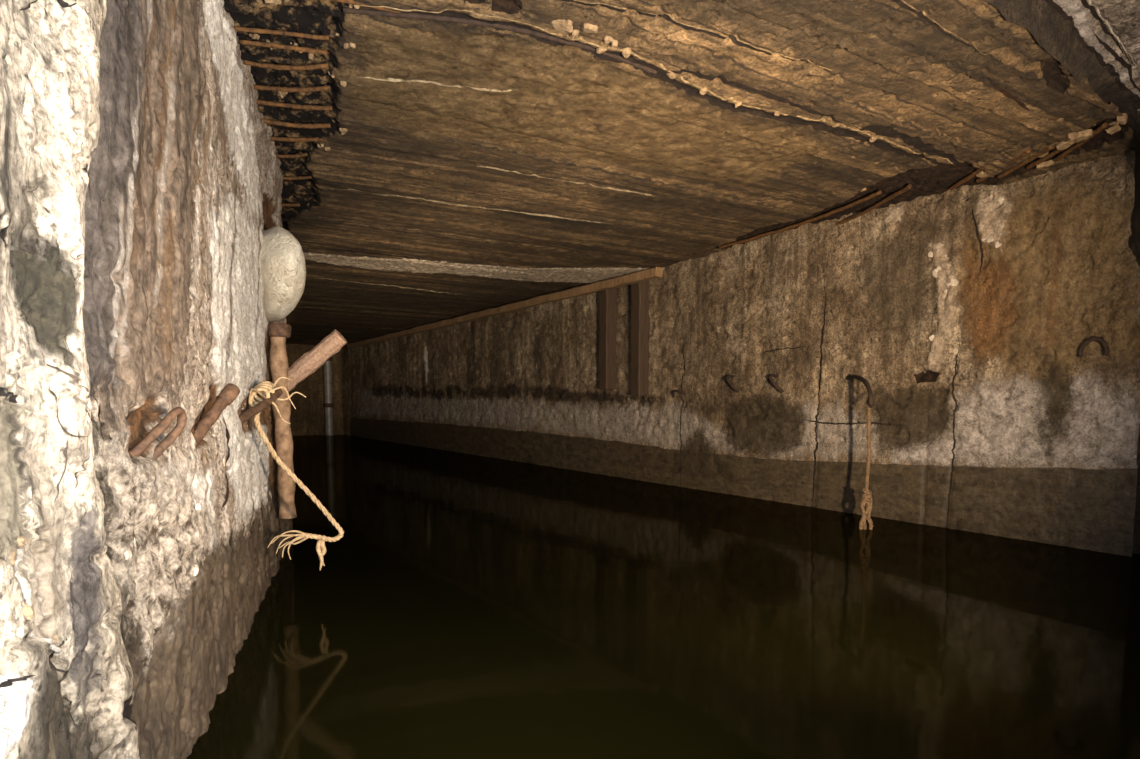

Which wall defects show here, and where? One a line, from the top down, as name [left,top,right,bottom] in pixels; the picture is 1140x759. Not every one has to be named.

crack [19,0,77,11]
water stain [0,0,151,396]
rust [90,0,237,470]
spalling [223,0,401,230]
spalling [303,248,665,283]
spalling [464,0,522,14]
crack [343,0,993,177]
crack [891,0,1030,111]
rust [964,184,1140,377]
water stain [23,0,294,759]
water stain [351,339,1140,557]